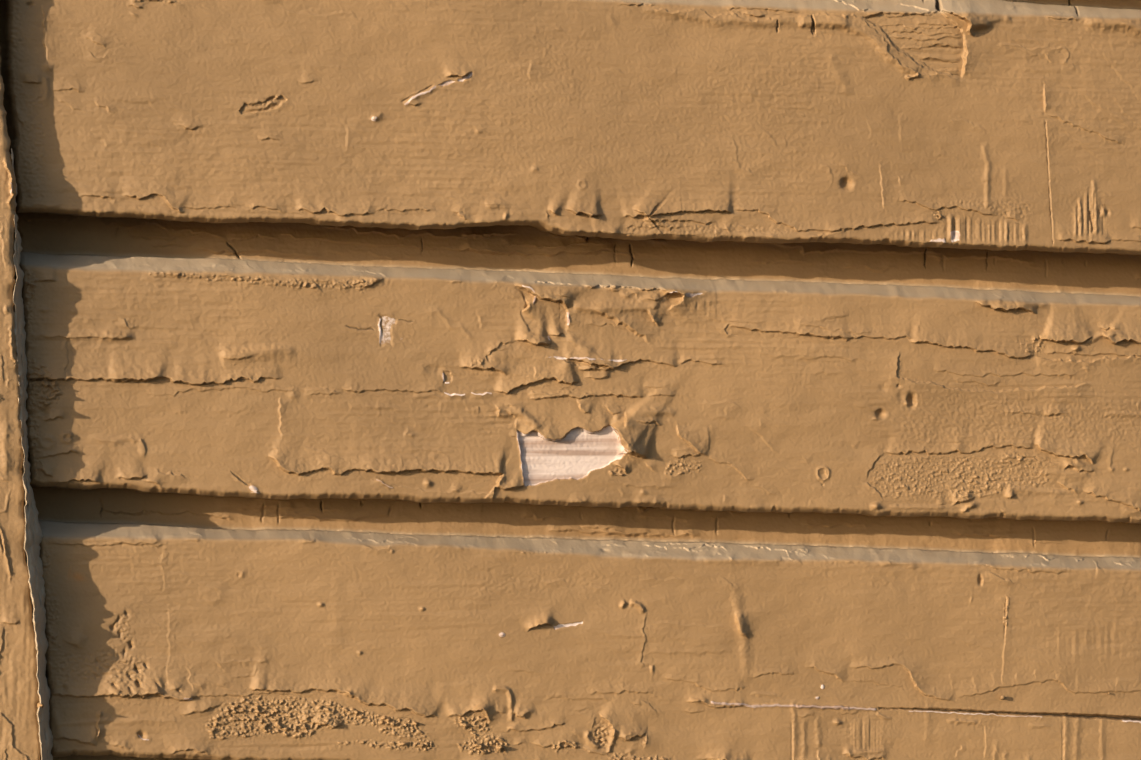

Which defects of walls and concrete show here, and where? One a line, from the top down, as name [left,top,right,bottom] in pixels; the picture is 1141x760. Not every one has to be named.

peeling [615,0,993,86]
crack [1039,0,1082,15]
crack [995,40,1128,247]
crack [0,219,12,271]
peeling [78,185,1035,387]
peeling [972,291,1141,376]
peeling [860,435,1141,521]
crack [0,616,32,760]
spalling [46,596,165,753]
crack [52,684,248,727]
peeling [167,677,588,758]
crack [542,592,1141,760]